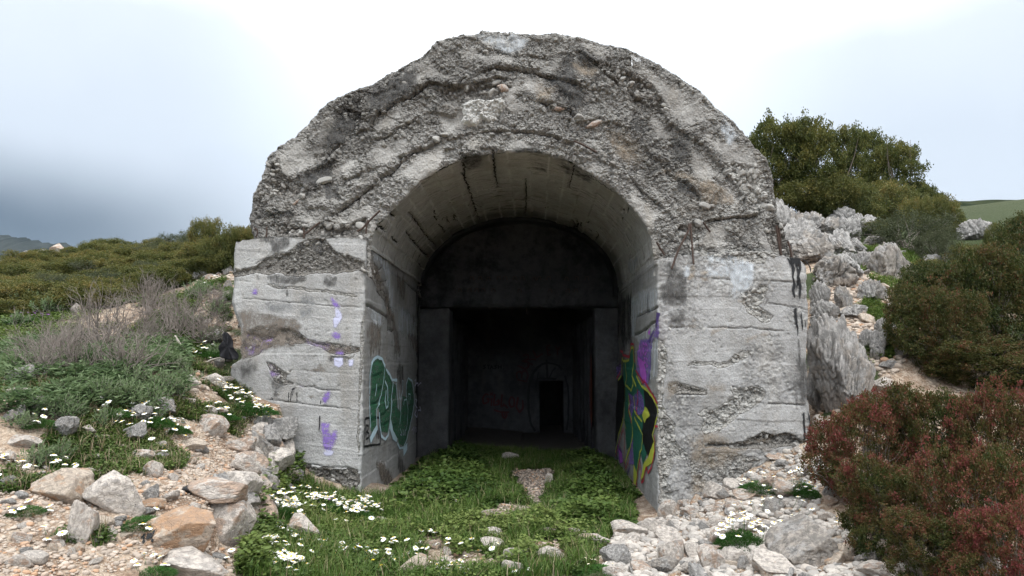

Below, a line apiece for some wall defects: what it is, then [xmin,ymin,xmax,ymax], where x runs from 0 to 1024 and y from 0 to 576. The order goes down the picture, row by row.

spalling [441,81,496,104]
spalling [595,61,668,114]
spalling [263,159,309,198]
spalling [232,210,393,321]
crack [246,68,581,332]
spalling [656,161,793,269]
water stain [787,258,812,299]
spalling [240,316,365,491]
spalling [656,340,808,504]